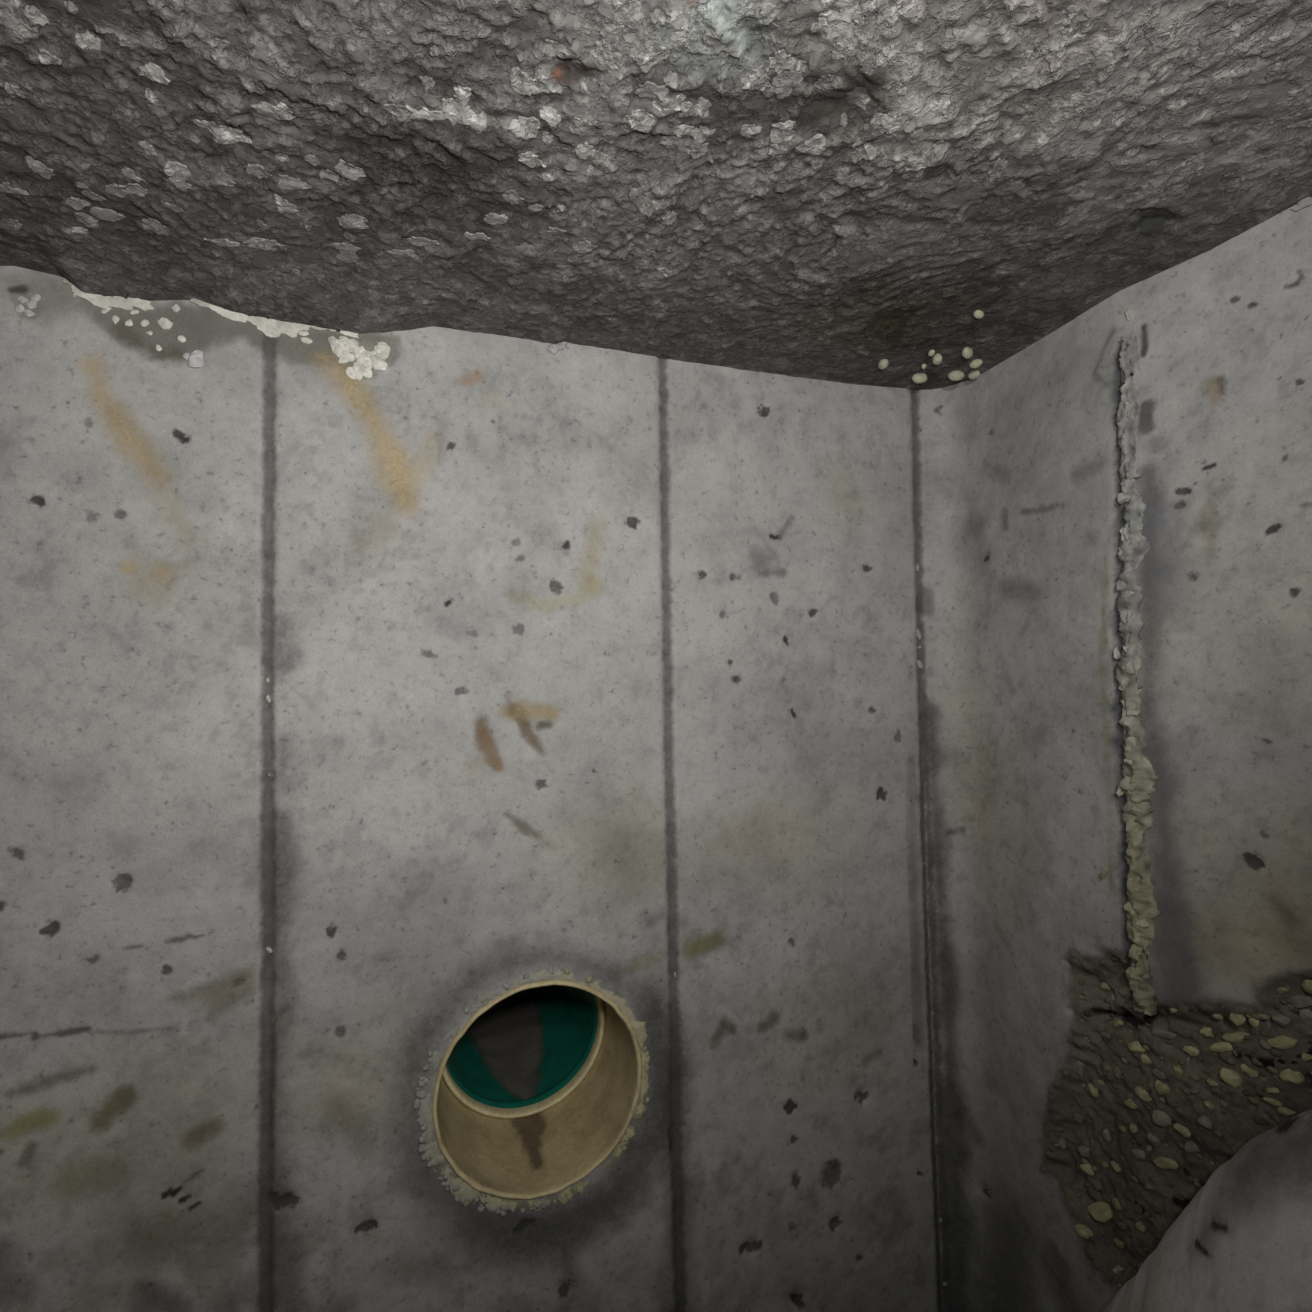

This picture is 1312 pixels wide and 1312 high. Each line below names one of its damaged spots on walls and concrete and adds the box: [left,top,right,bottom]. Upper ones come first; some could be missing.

rust [477,720,502,770]
rust [505,706,556,747]
spalling [1040,948,1312,1288]